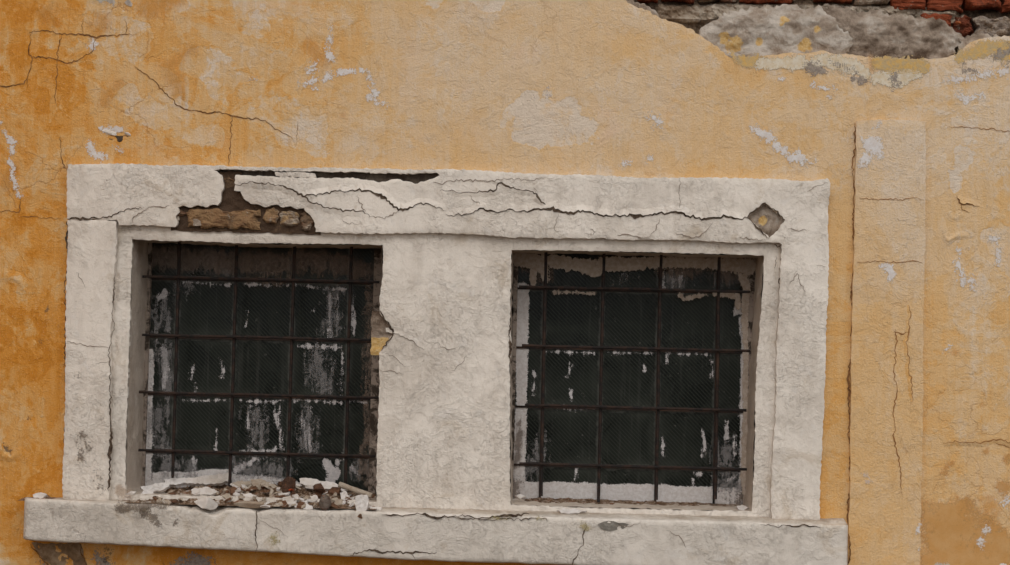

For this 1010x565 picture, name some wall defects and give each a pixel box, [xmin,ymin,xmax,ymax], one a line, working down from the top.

crack [0,0,136,103]
flaking render [626,0,1010,59]
crack [136,67,298,159]
crack [234,178,824,294]
flaking render [748,204,784,238]
flaking render [370,311,392,355]
crack [380,311,466,374]
crack [506,319,514,364]
crack [846,124,922,565]
crack [385,513,547,521]
spalling [31,542,115,565]
crack [350,549,437,558]